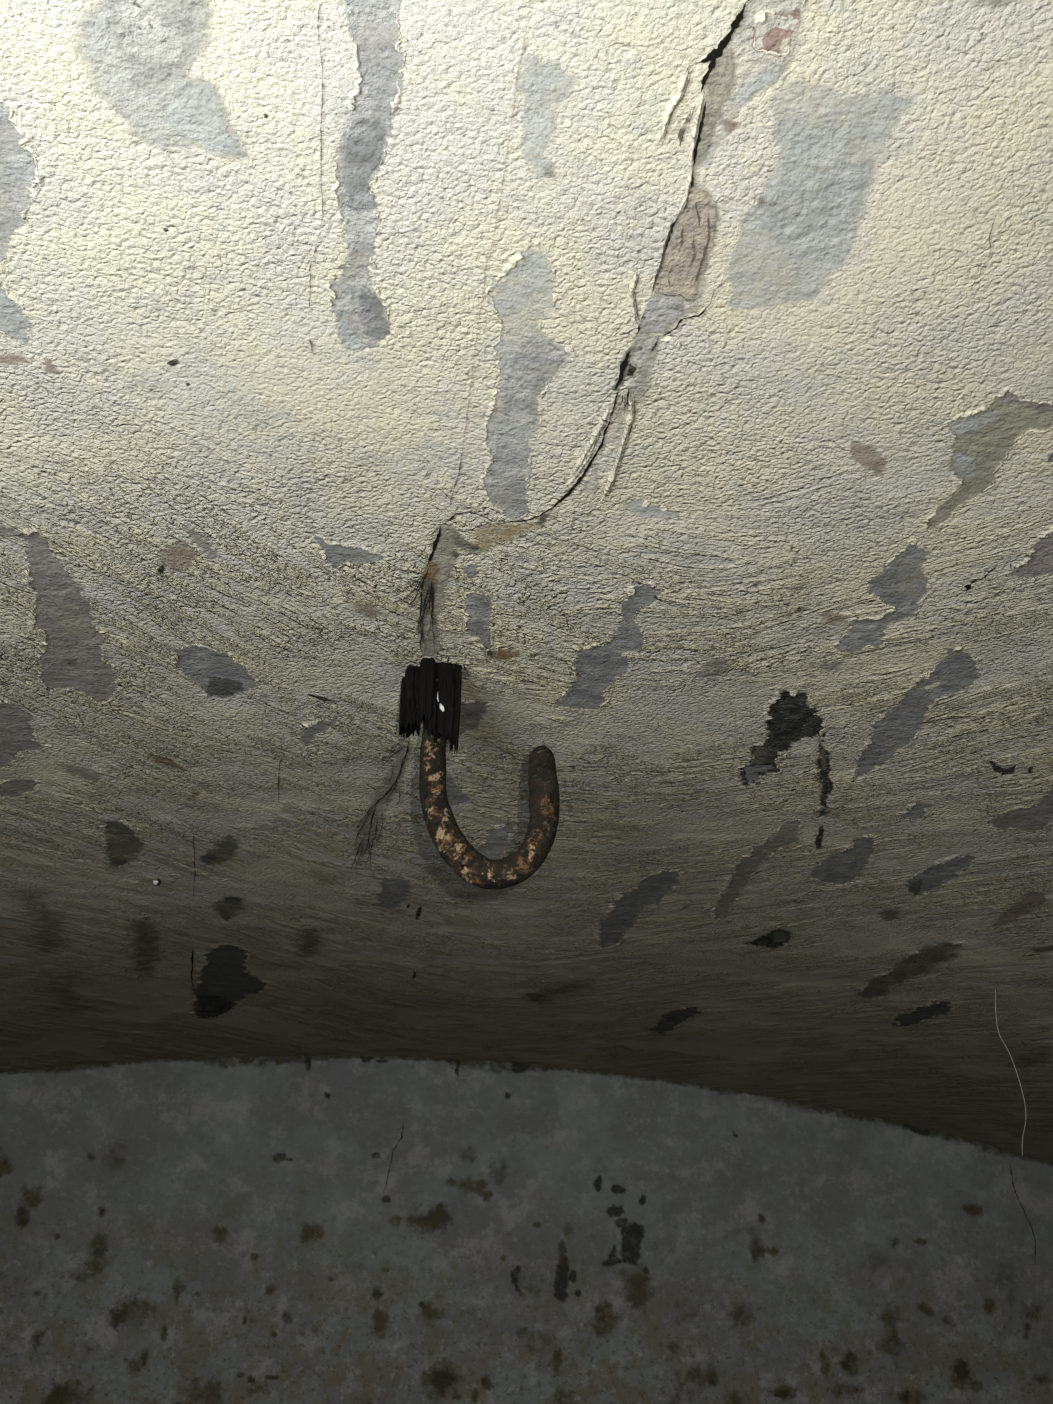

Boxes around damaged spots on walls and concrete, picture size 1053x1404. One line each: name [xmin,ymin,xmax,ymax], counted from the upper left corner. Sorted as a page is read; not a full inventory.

crack [425,0,749,566]
peeling [629,0,807,373]